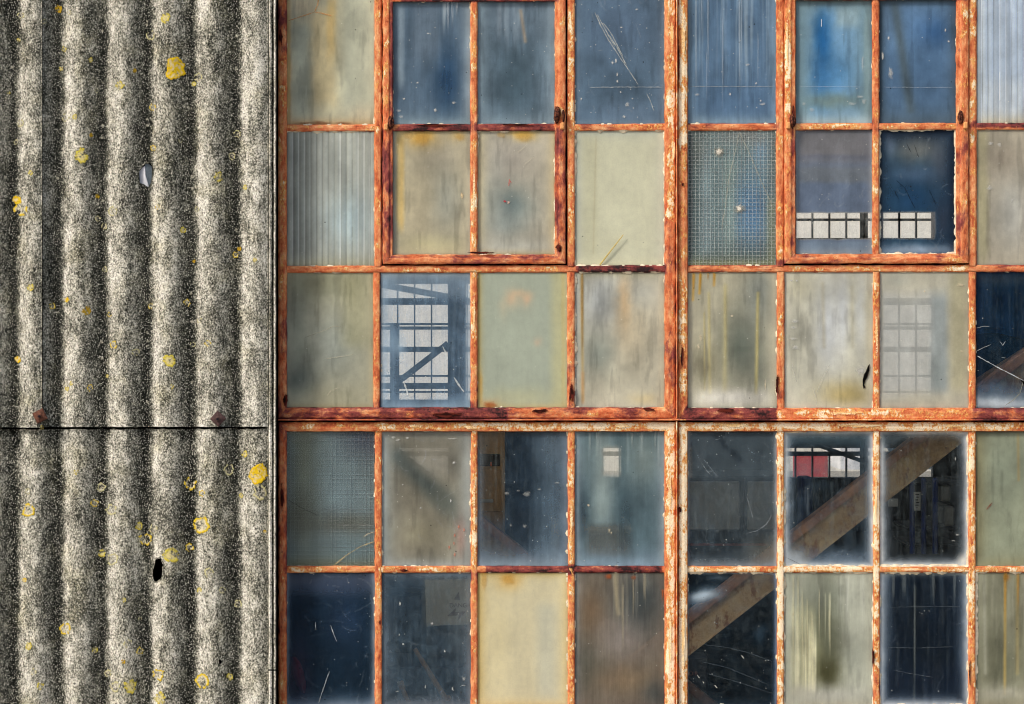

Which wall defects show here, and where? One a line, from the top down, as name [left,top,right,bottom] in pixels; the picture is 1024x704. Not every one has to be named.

peeling [670,16,685,78]
spalling [153,558,163,582]
peeling [668,607,685,671]